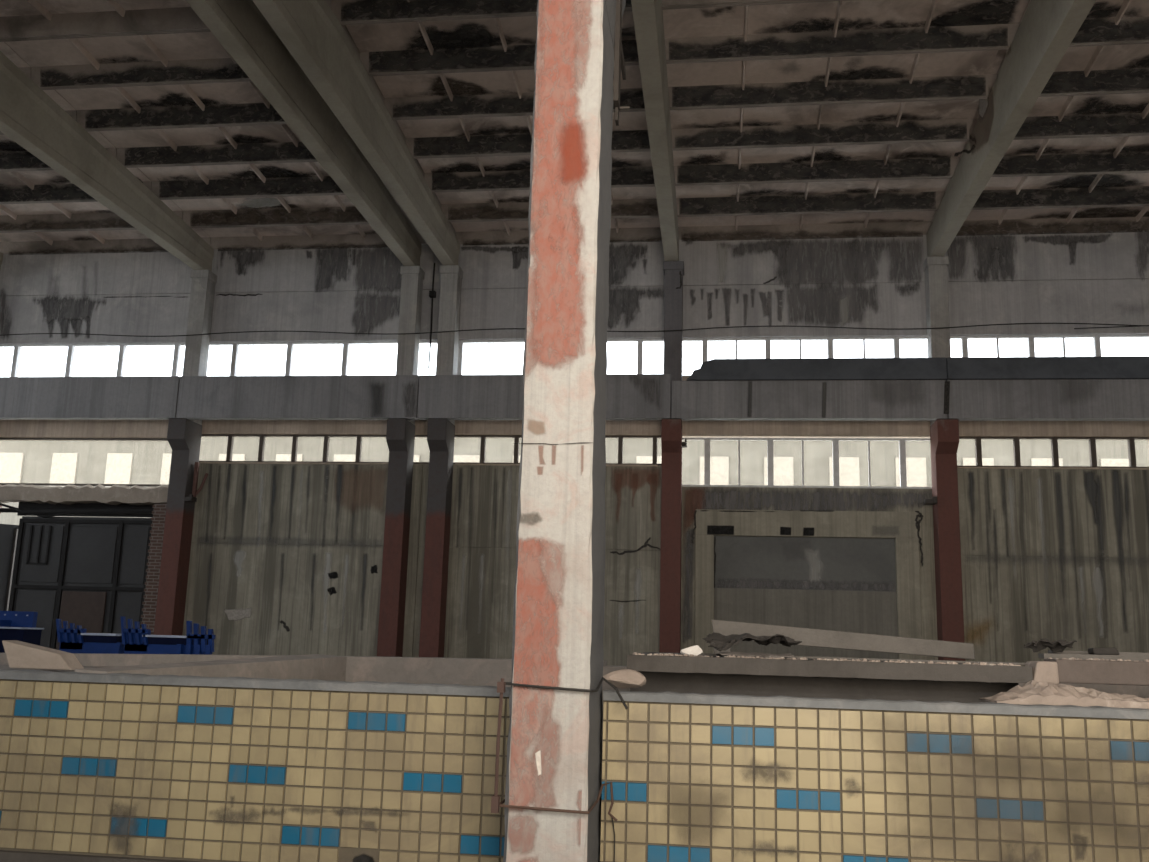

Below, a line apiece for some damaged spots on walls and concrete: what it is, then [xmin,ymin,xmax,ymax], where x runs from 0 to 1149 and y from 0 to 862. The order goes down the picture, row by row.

water stain [669,0,1018,60]
water stain [1071,2,1149,43]
water stain [672,68,986,107]
water stain [0,141,168,255]
water stain [40,57,404,335]
peeling [526,0,591,374]
water stain [676,114,967,326]
water stain [948,55,1149,281]
water stain [34,297,106,338]
crack [610,538,661,555]
crack [691,510,833,588]
peeling [509,538,564,862]